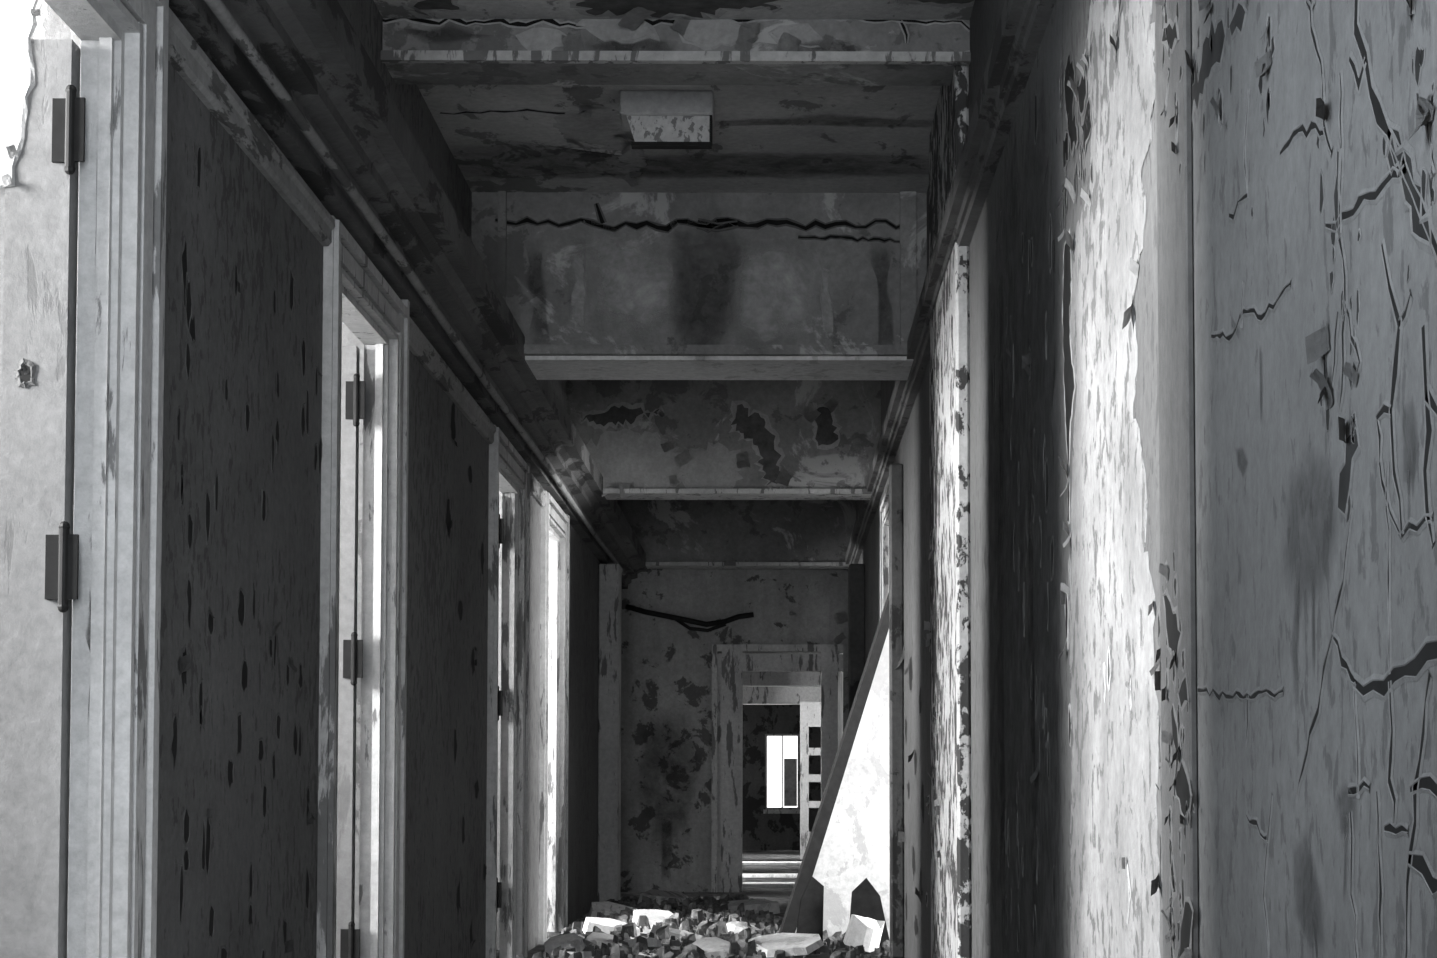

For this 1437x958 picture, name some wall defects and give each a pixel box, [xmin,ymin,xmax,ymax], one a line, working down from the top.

flaking render [407,0,466,16]
peeling [515,0,834,51]
flaking render [1255,10,1276,140]
crack [495,203,900,244]
crack [1211,279,1291,344]
peeling [569,400,795,498]
flaking render [800,396,842,450]
peeling [993,0,1249,958]
crack [1228,0,1437,958]